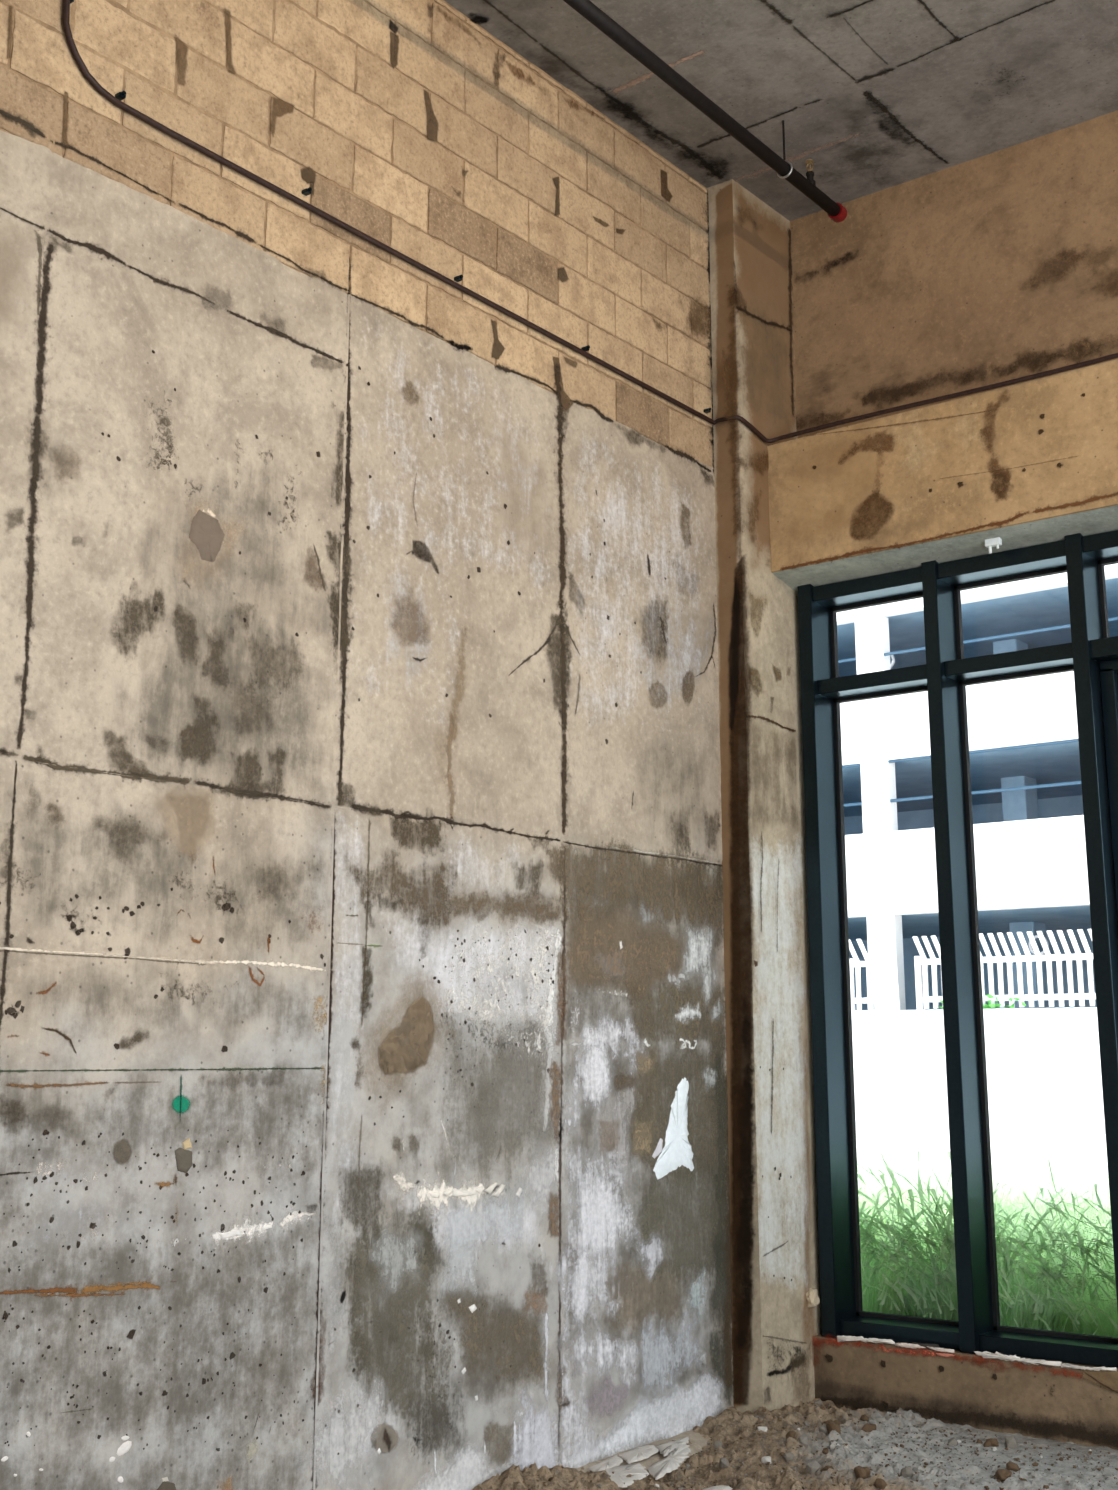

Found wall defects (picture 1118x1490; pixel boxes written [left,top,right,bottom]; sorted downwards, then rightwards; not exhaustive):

leakage [863,335,1113,405]
leakage [982,395,1011,499]
leakage [851,492,893,540]
leakage [114,592,228,684]
leakage [105,732,149,778]
leakage [150,698,285,797]
leakage [119,1032,145,1048]
leakage [315,556,815,1490]
flaking render [652,1078,694,1179]
spalling [393,1149,559,1211]
leakage [212,1205,316,1242]
corrosion [0,1281,160,1301]